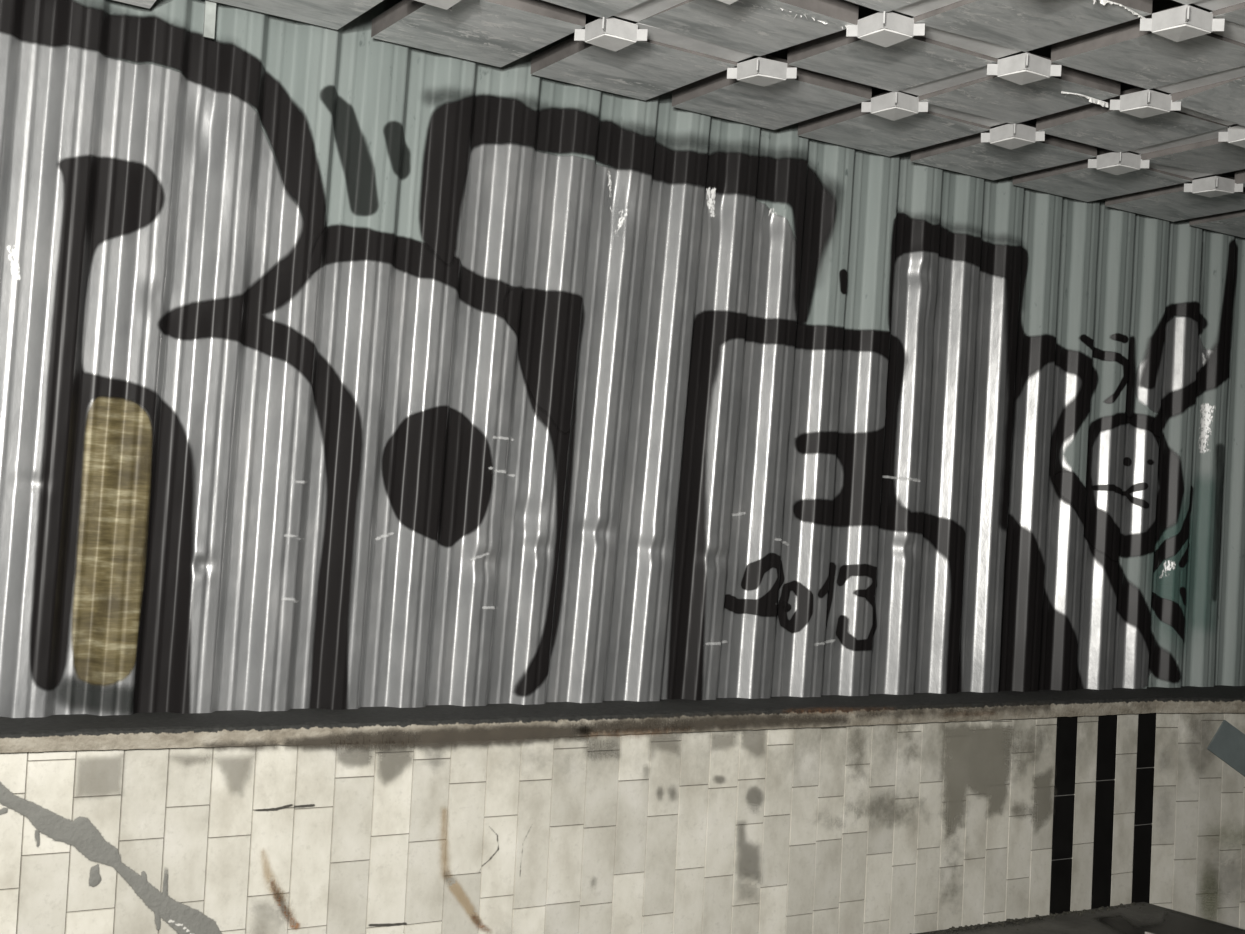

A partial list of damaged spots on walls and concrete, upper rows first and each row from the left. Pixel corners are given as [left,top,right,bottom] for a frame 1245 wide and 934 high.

water stain [943,725,1051,835]
crack [256,803,315,811]
corrosion [272,882,299,929]
crack [369,920,407,928]